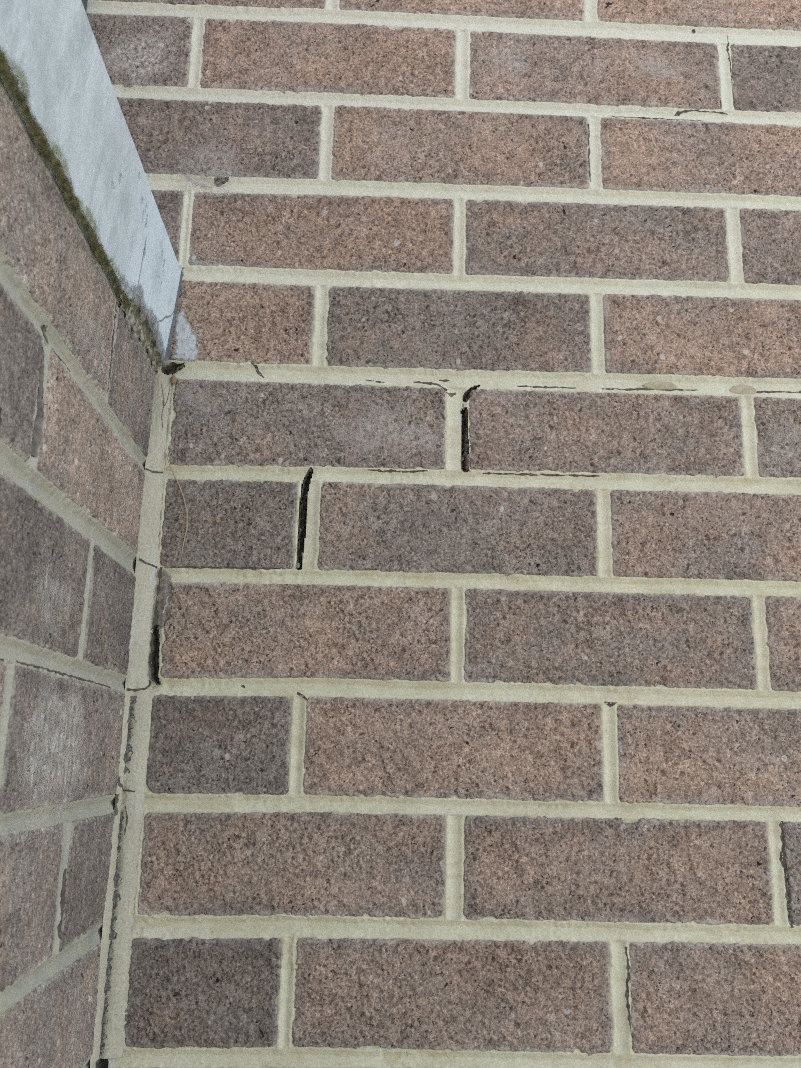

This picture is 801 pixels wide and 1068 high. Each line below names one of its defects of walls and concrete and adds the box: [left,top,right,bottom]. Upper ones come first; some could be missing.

crack [602,385,697,393]
crack [756,388,801,396]
crack [414,379,600,477]
crack [368,467,428,475]
crack [0,467,313,1056]